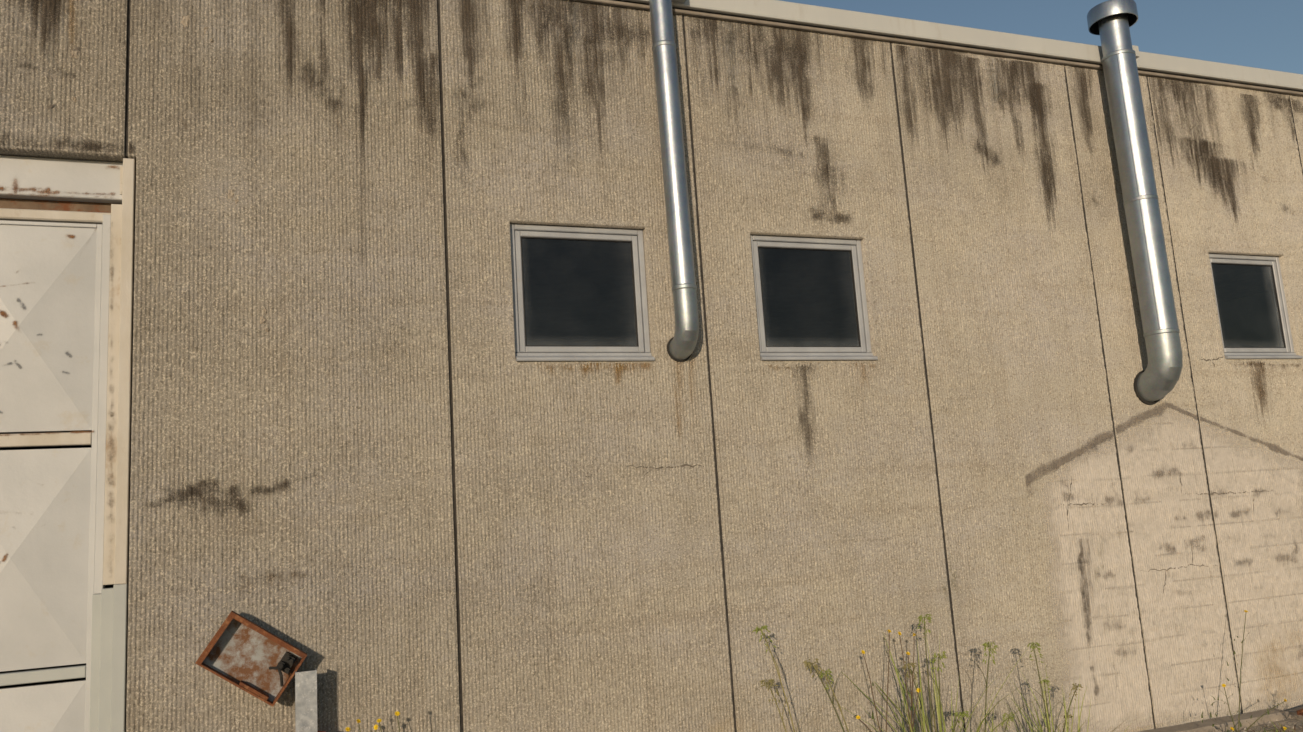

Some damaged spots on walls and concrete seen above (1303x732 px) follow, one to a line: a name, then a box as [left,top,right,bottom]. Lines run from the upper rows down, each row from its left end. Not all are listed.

water stain [20,0,60,46]
water stain [280,0,315,83]
water stain [348,0,435,148]
water stain [461,0,476,77]
water stain [509,0,622,142]
water stain [703,19,718,83]
water stain [854,38,872,93]
water stain [747,24,848,222]
water stain [898,45,1055,206]
water stain [1149,77,1238,217]
water stain [1244,95,1259,150]
water stain [170,481,289,512]